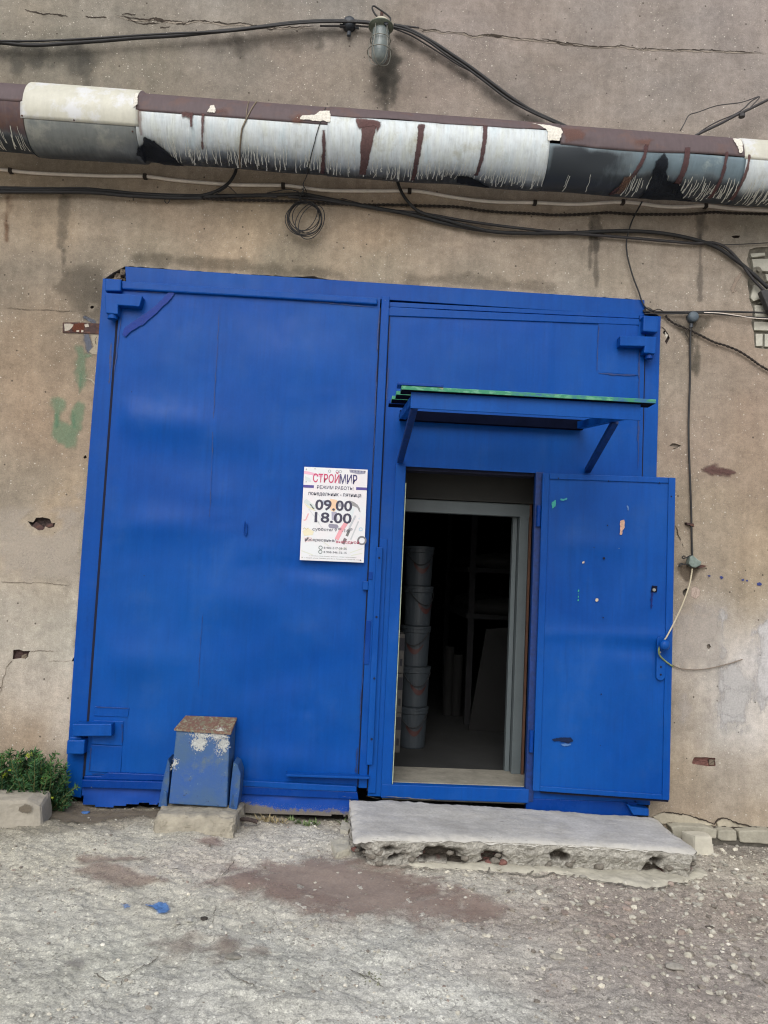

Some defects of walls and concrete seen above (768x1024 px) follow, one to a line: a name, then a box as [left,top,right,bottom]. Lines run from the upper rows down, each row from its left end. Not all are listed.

crack [25,9,314,30]
crack [416,28,763,54]
water stain [373,50,400,95]
corrosion [182,112,205,150]
peeling [297,111,330,122]
corrosion [356,118,381,175]
corrosion [674,147,690,184]
corrosion [708,152,728,198]
corrosion [729,154,751,200]
spalling [28,517,55,530]
spalling [692,757,715,766]
spalling [330,805,697,877]